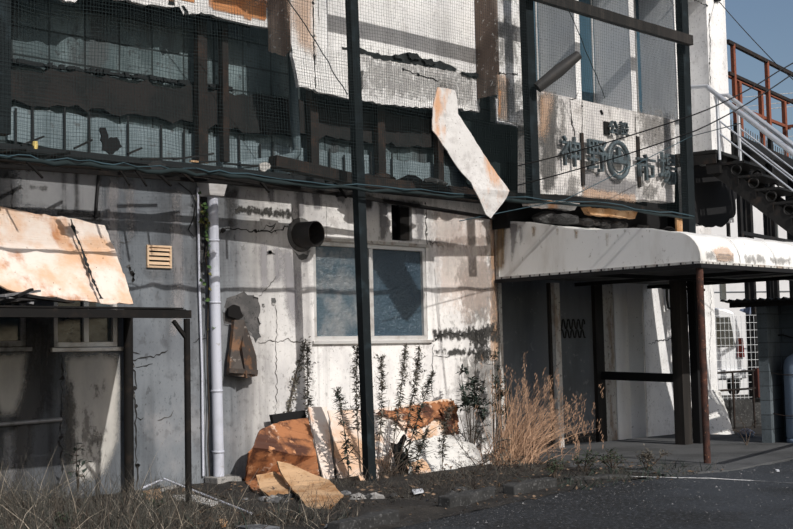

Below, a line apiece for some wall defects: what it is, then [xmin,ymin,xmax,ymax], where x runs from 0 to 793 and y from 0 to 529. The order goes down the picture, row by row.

corrosion [211,0,268,20]
peeling [393,52,436,66]
crack [219,208,293,255]
corrosion [715,247,733,261]
spalling [223,292,276,343]
crack [254,277,304,414]
water stain [433,323,501,365]
water stain [0,320,56,487]
crack [57,355,65,471]
water stain [62,354,120,486]